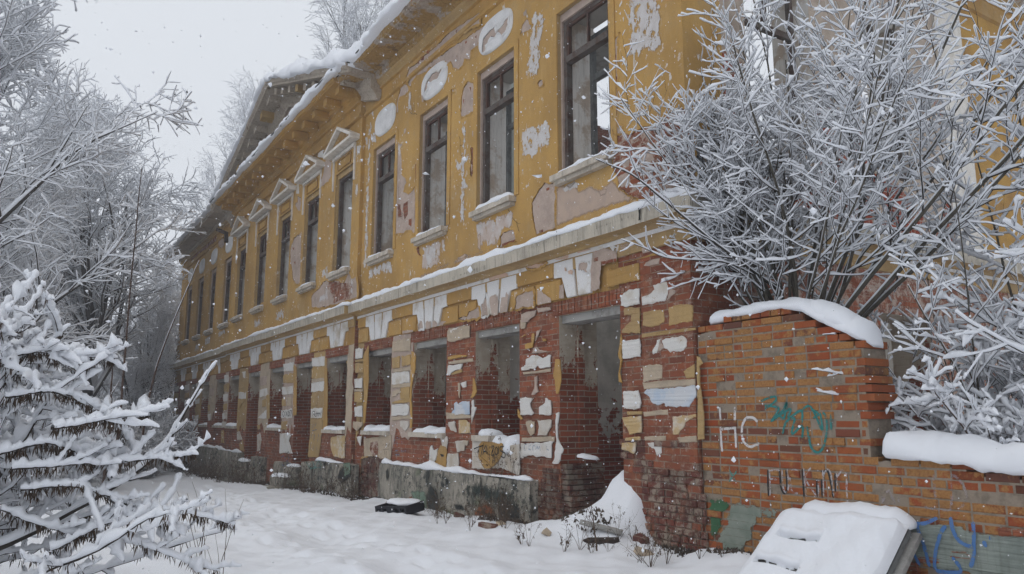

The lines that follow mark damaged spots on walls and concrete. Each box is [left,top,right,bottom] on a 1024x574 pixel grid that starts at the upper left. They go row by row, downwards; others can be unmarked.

spalling [396,10,545,229]
peeling [522,112,550,158]
flaking render [611,0,698,200]
spalling [393,128,416,236]
spalling [528,180,557,236]
spalling [498,228,517,248]
peeling [308,244,705,497]
water stain [426,471,519,519]
peeling [709,499,781,550]